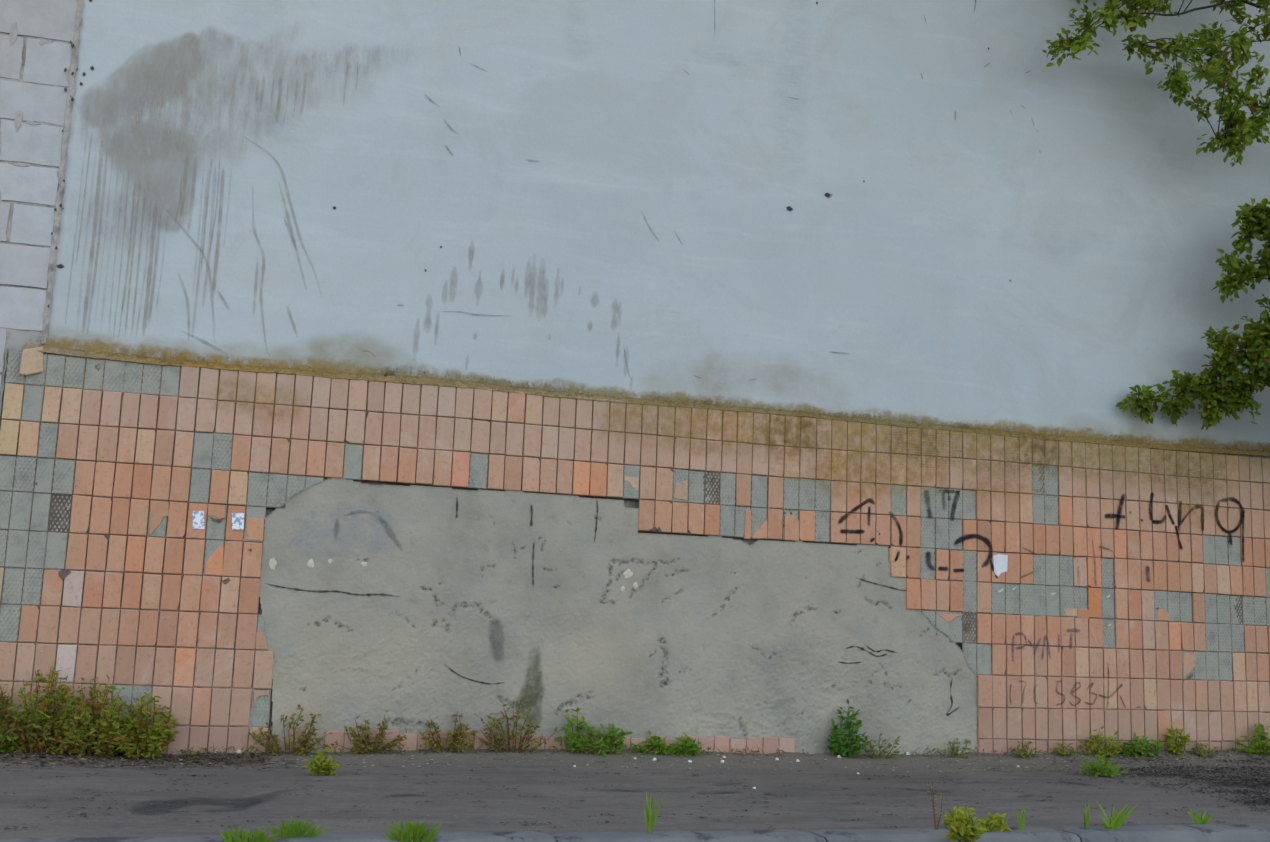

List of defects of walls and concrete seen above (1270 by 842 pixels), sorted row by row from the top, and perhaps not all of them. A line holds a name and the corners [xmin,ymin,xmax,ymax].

peeling [0,351,181,642]
peeling [189,432,233,576]
spalling [243,444,1115,755]
peeling [1154,568,1270,681]
peeling [1202,535,1241,566]